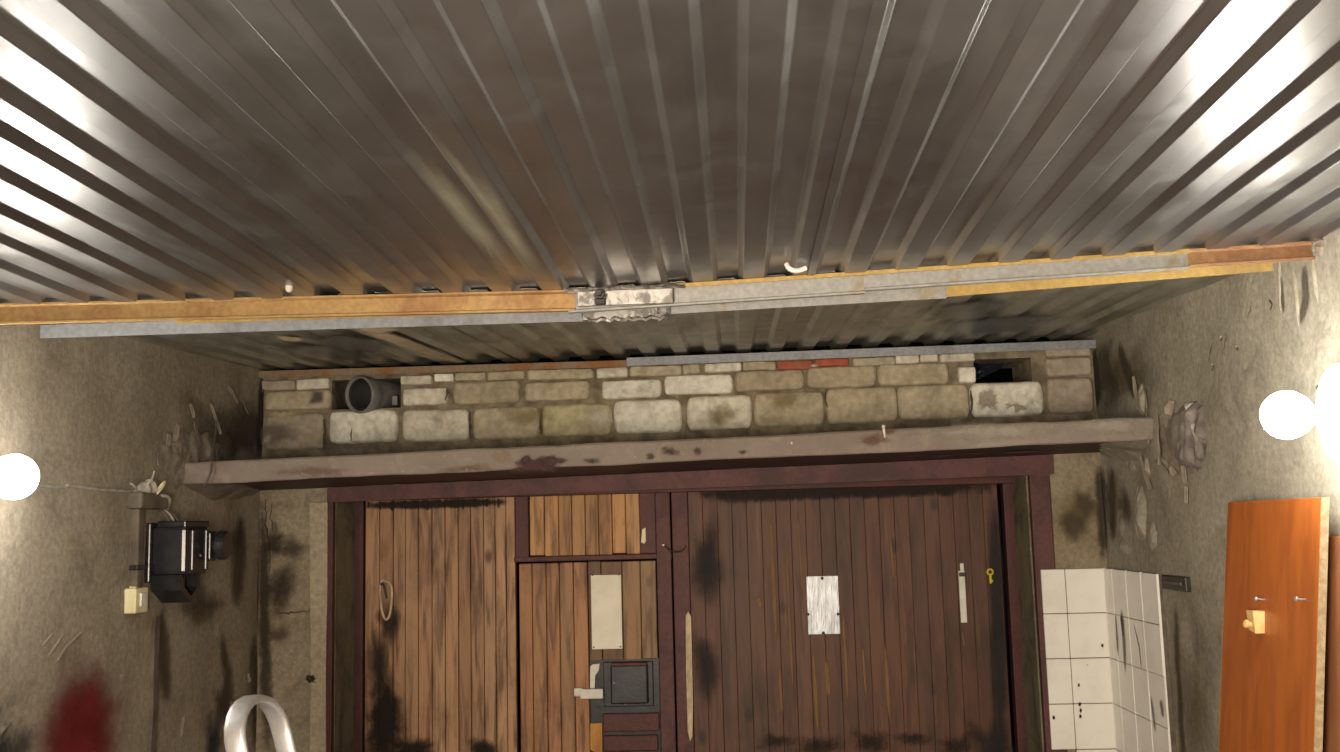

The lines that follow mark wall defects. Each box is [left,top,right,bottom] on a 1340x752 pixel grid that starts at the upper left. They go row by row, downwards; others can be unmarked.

peeling [153,403,223,490]
peeling [1132,376,1207,504]
leakage [1064,471,1129,553]
leakage [159,615,170,697]
leakage [208,641,233,752]
leakage [233,517,301,744]